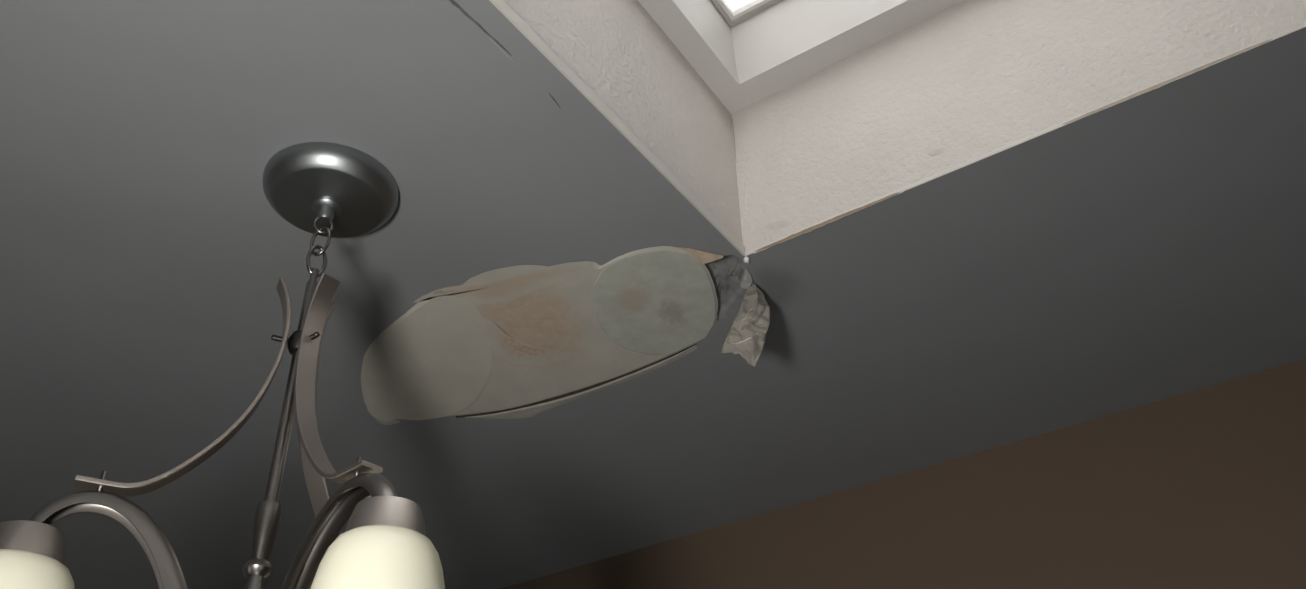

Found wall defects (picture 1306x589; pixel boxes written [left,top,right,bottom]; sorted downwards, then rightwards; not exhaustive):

crack [449,0,514,61]
flaking render [361,246,770,425]